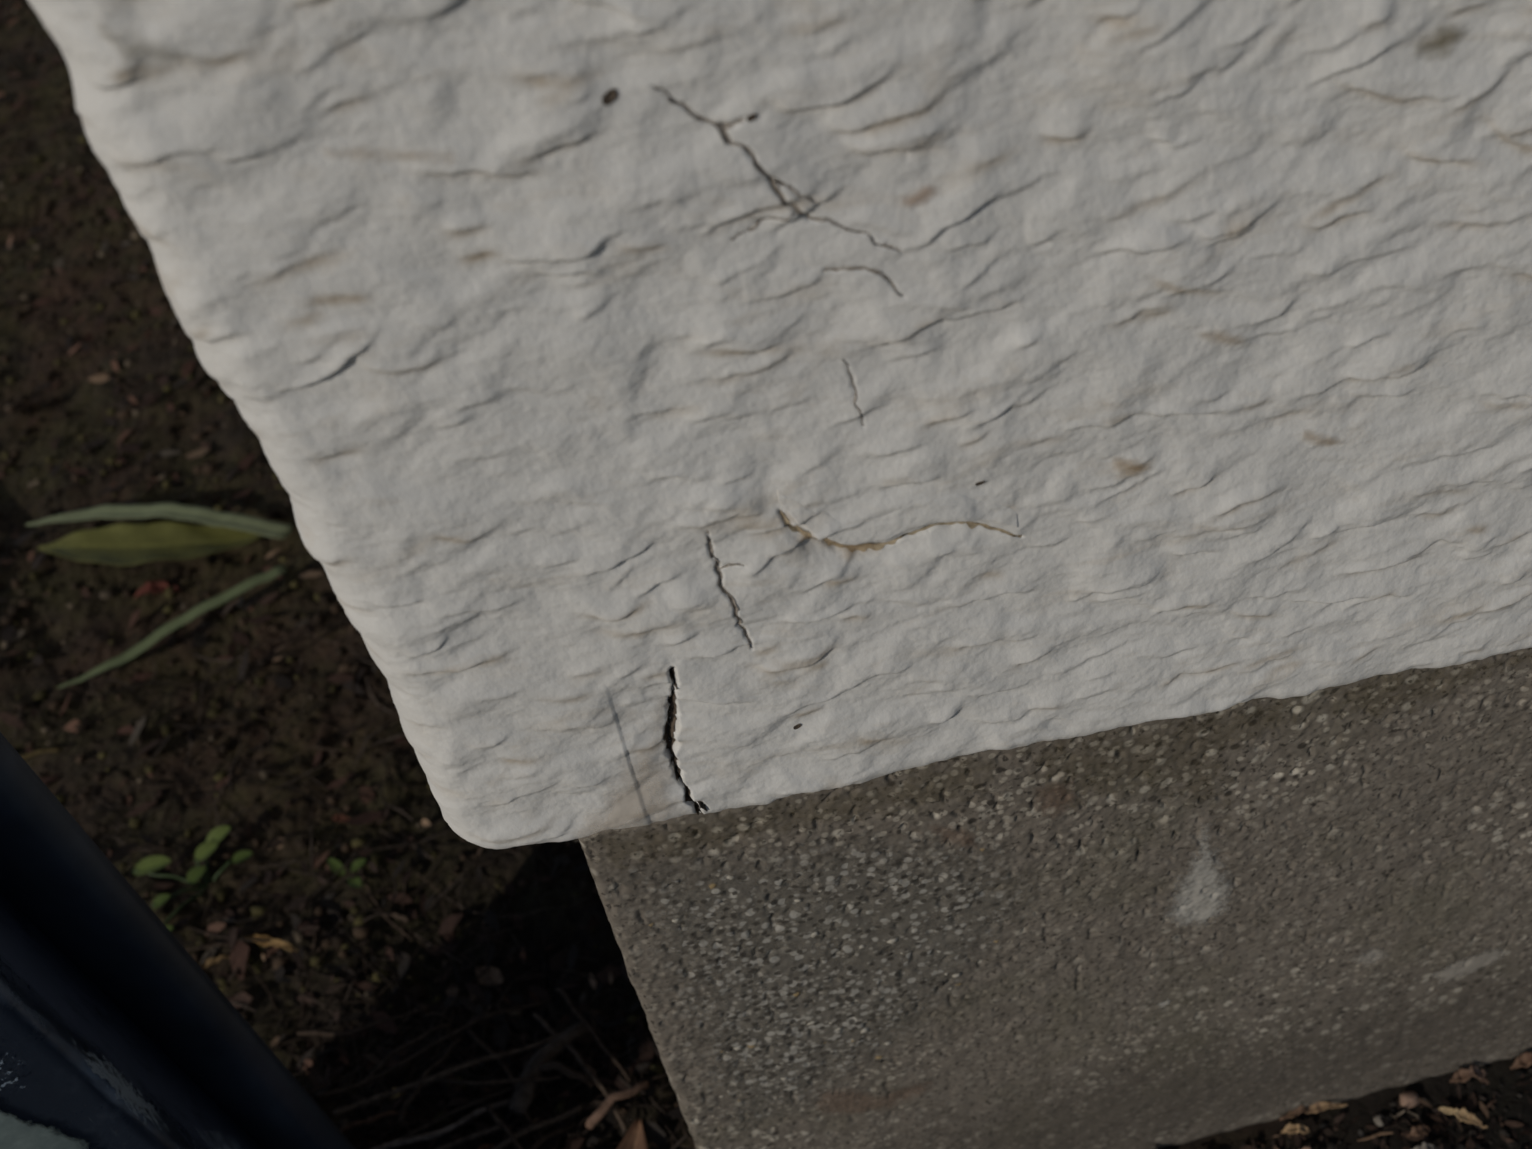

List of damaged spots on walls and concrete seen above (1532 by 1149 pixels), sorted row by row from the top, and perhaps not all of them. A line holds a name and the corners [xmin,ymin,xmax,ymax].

crack [653,87,903,296]
crack [706,531,751,649]
crack [664,667,708,816]